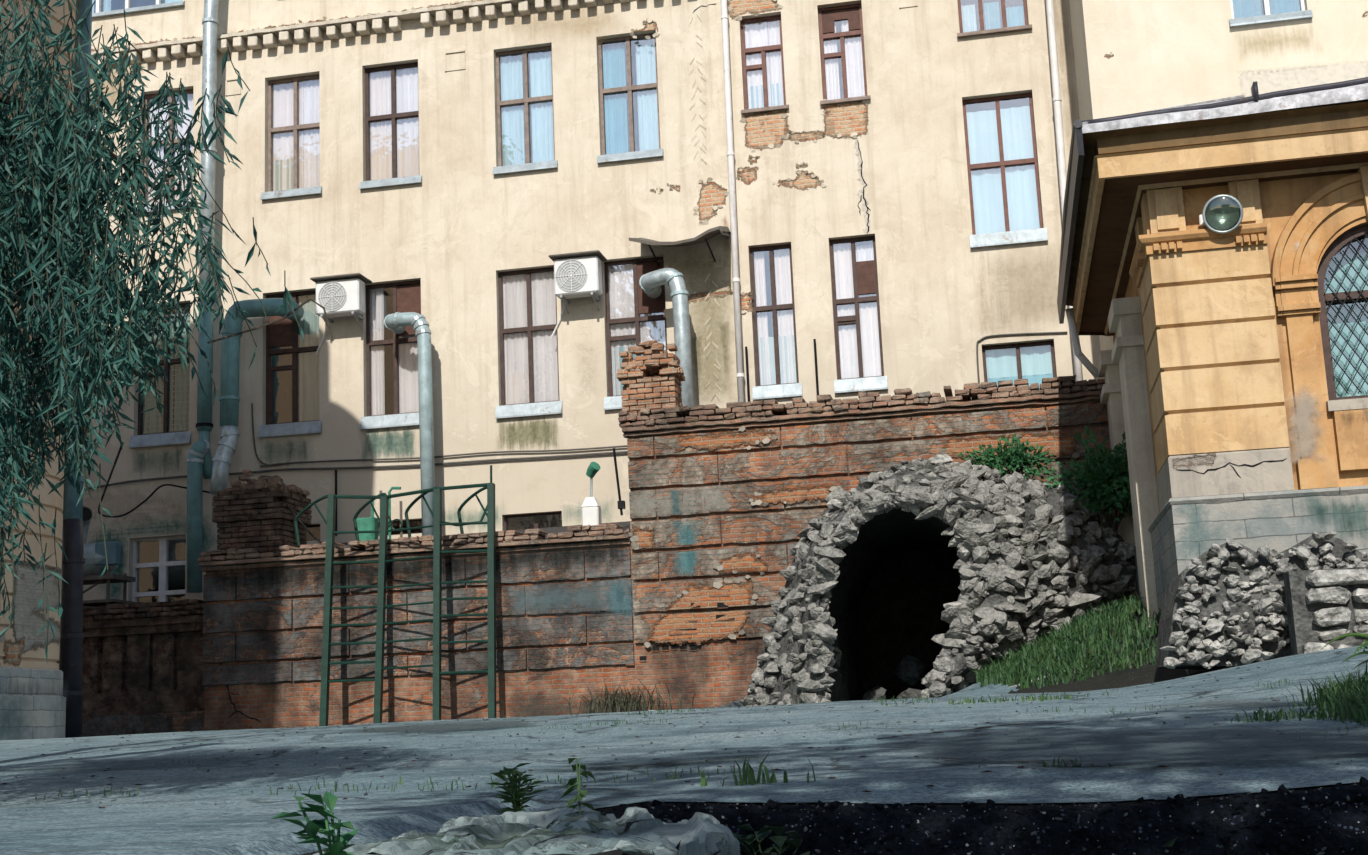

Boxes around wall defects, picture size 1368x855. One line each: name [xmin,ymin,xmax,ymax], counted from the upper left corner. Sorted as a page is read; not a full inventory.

peeling [727,0,783,21]
peeling [689,14,870,225]
crack [854,140,871,234]
crack [1176,458,1287,478]
peeling [3,561,62,666]
peeling [613,550,768,665]